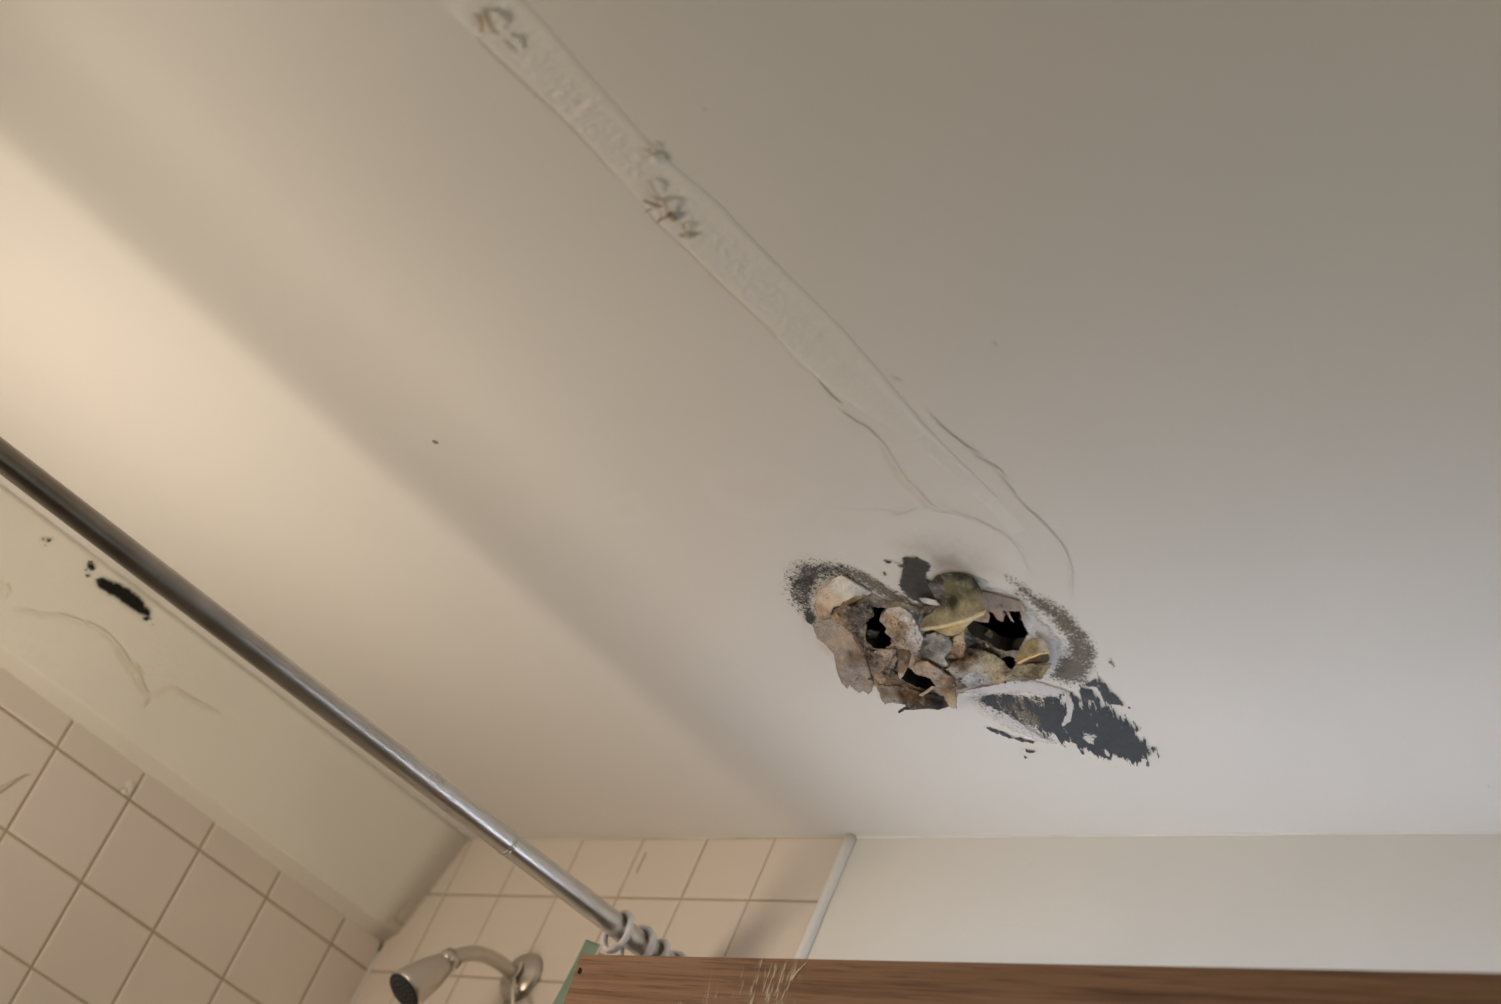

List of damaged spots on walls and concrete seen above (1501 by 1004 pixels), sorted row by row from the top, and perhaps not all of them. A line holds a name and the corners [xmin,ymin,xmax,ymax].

damp [85,560,153,625]
spalling [813,572,1074,744]